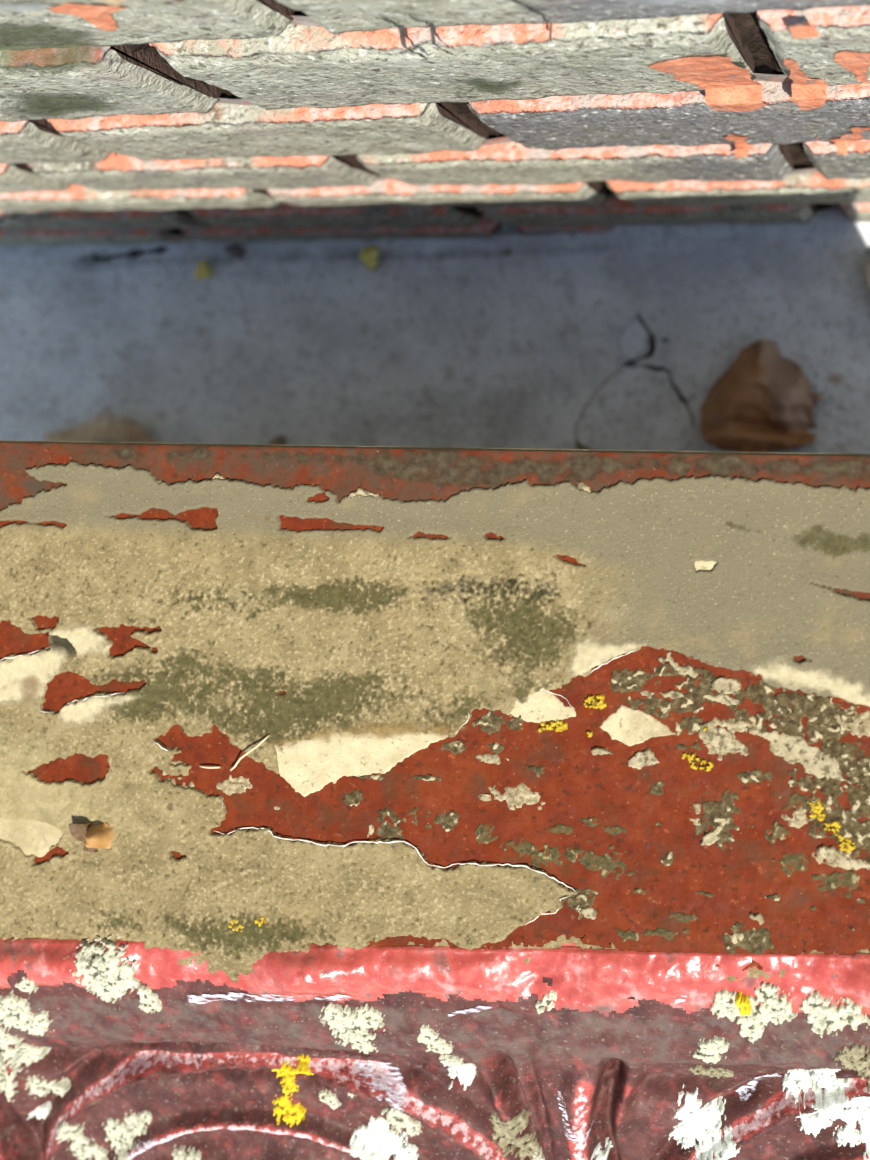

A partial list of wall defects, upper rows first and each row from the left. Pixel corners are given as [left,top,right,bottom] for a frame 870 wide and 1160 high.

spalling [49,3,126,31]
spalling [789,25,821,39]
spalling [648,56,768,112]
spalling [784,59,828,110]
spalling [834,51,870,96]
spalling [724,134,749,159]
spalling [816,127,870,155]
peeling [0,443,870,531]
peeling [823,585,870,600]
flaking render [0,615,161,724]
peeling [28,753,110,783]
peeling [151,640,870,971]